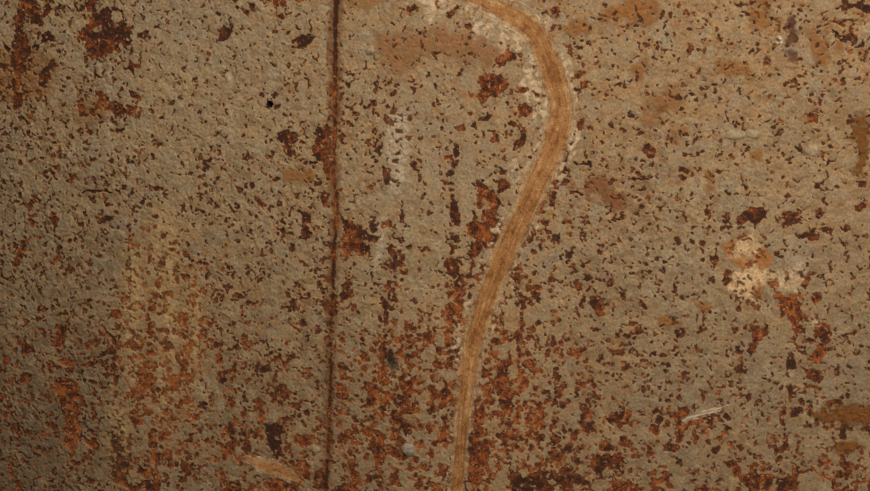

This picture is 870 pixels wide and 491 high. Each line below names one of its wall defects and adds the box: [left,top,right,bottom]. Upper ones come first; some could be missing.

corrosion [0,0,58,113]
corrosion [77,0,169,72]
corrosion [77,91,141,121]
corrosion [367,167,394,190]
crack [322,0,343,491]
corrosion [122,212,178,387]
corrosion [50,323,85,460]
corrosion [106,397,145,484]
corrosion [507,467,558,491]
corrosion [589,408,644,491]
corrosion [672,406,711,441]
corrosion [735,470,798,491]